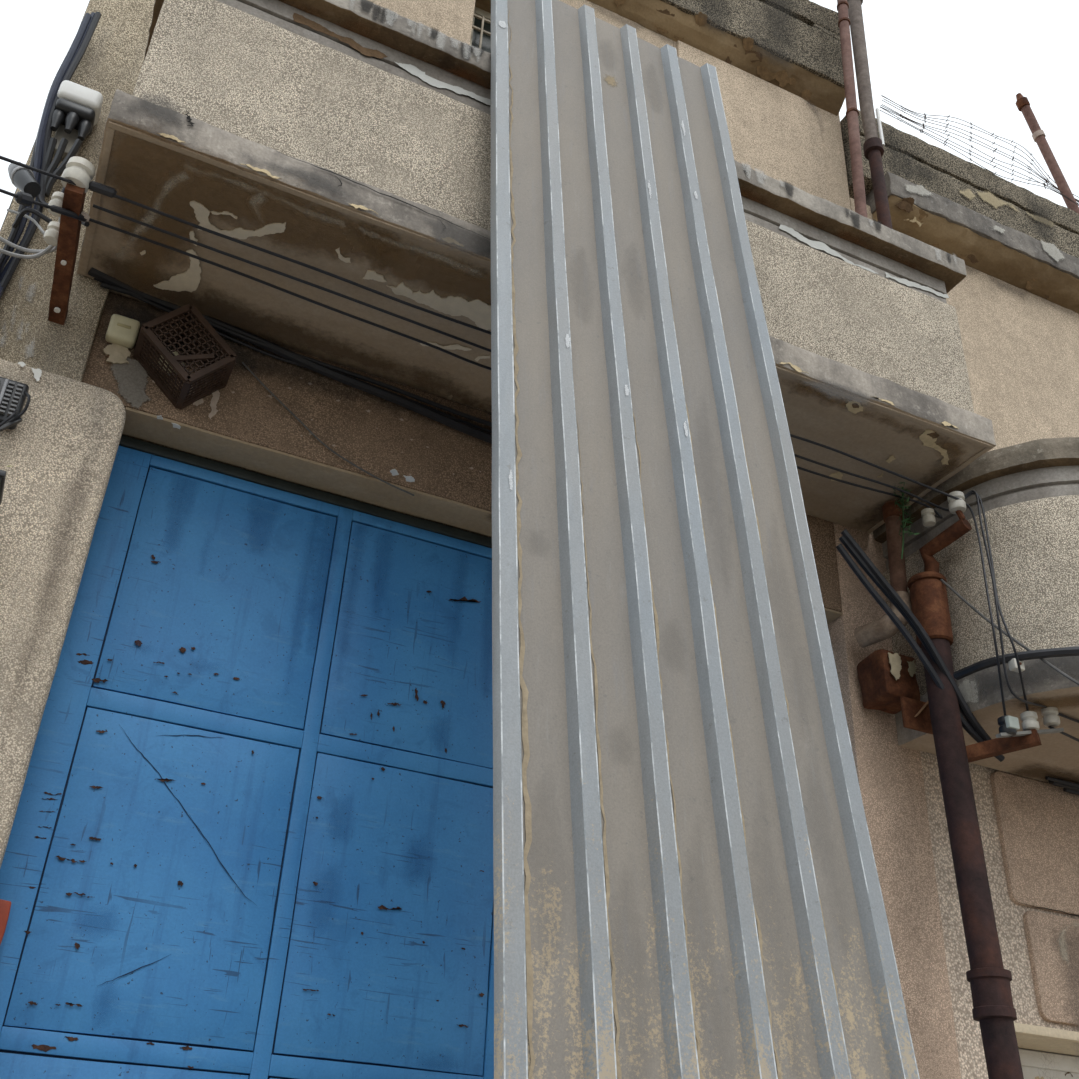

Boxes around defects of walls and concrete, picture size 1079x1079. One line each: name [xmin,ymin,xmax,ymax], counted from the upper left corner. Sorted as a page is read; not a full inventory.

water stain [139,96,179,121]
spalling [241,164,281,179]
peeling [153,201,286,292]
water stain [104,135,492,408]
water stain [797,382,868,407]
spalling [919,421,959,465]